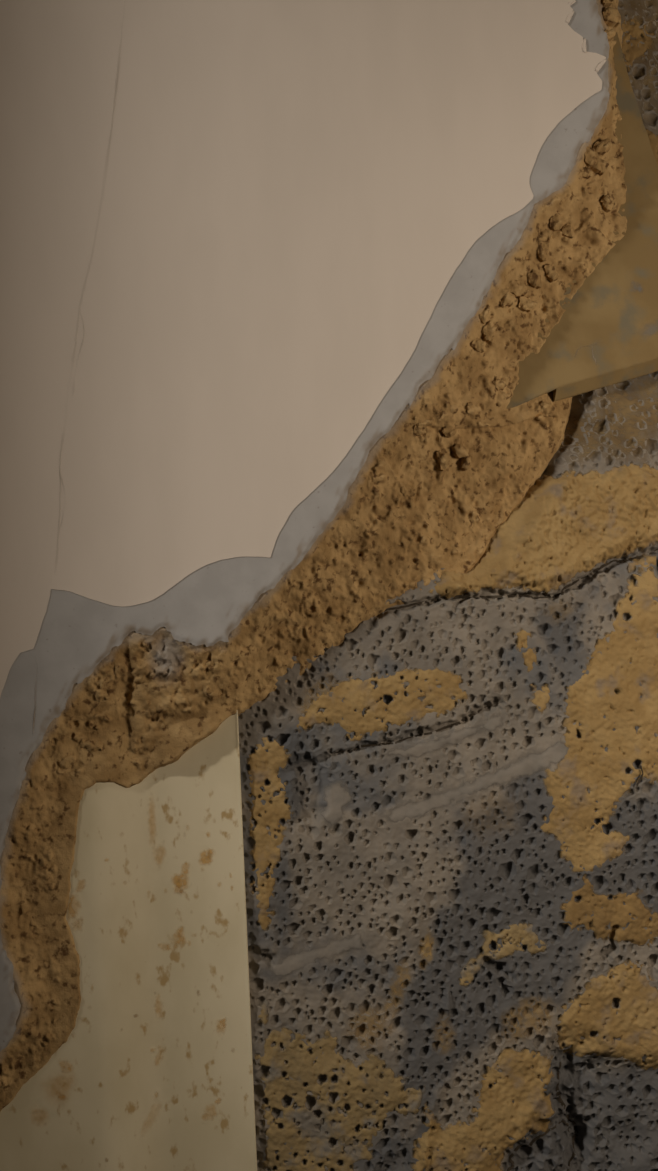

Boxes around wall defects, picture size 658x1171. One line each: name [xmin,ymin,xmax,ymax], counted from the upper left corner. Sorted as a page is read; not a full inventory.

flaking render [596,0,623,48]
peeling [529,0,612,201]
flaking render [537,241,549,262]
flaking render [537,229,552,242]
flaking render [549,214,564,232]
flaking render [561,224,574,239]
peeling [0,197,539,859]
crack [385,549,658,611]
crack [334,705,492,754]
peeling [0,929,21,1052]